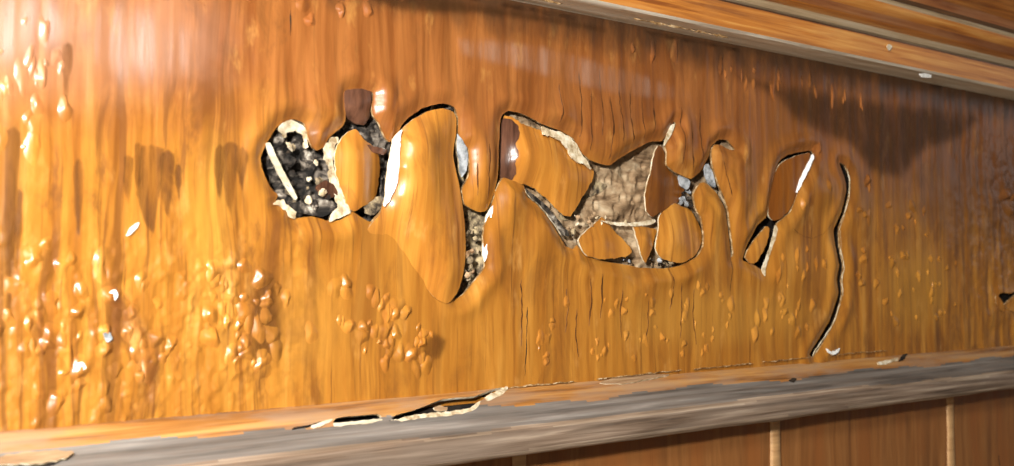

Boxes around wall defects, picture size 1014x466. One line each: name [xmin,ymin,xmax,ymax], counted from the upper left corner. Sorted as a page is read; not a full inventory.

spalling [261,111,391,222]
spalling [400,104,468,190]
spalling [495,111,812,269]
spalling [454,200,492,298]
crack [810,163,850,357]